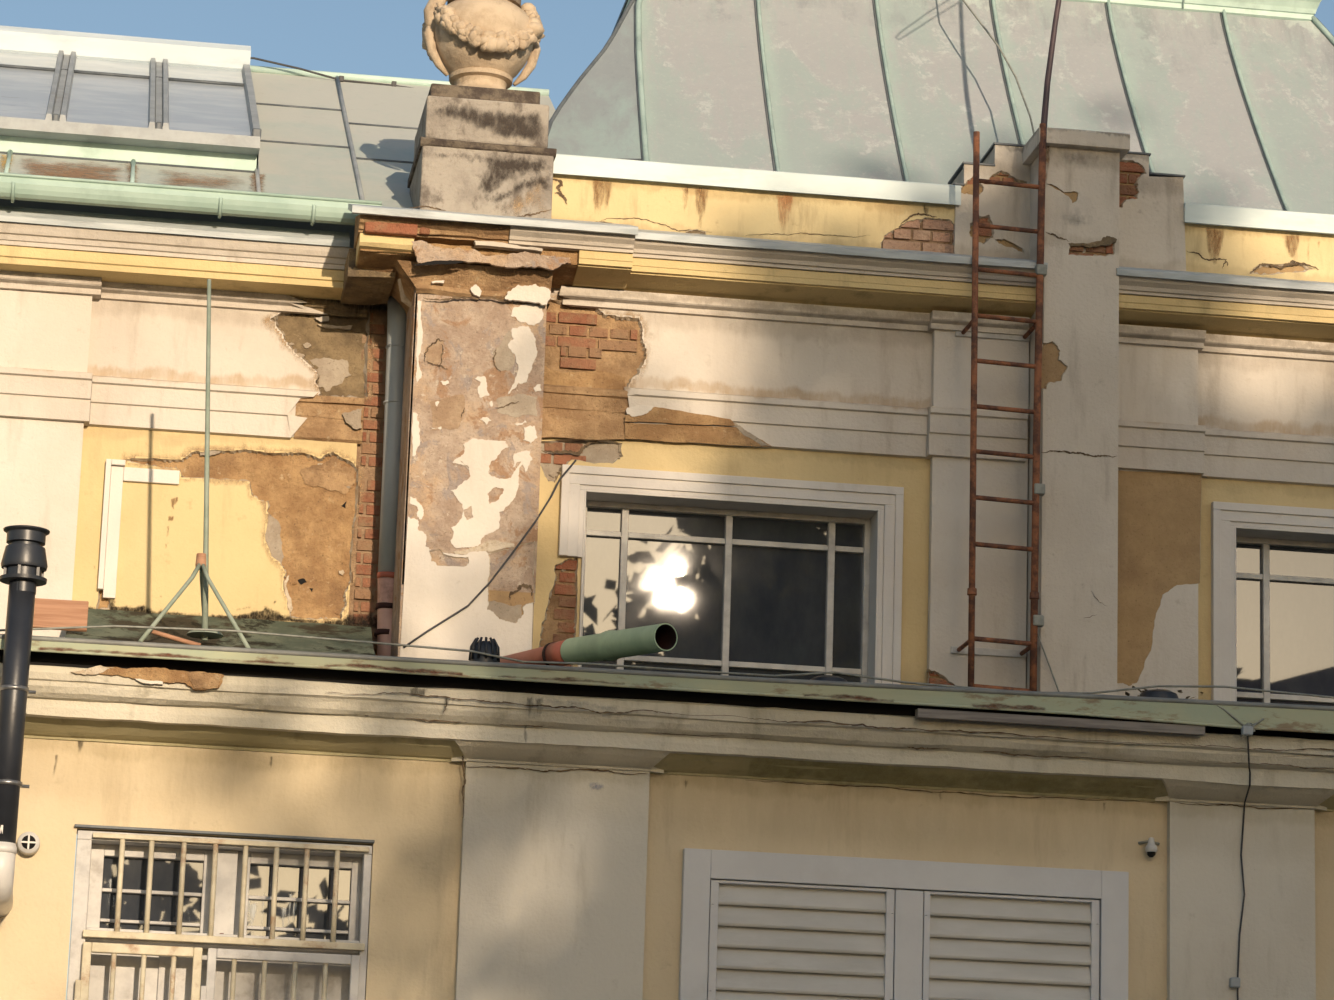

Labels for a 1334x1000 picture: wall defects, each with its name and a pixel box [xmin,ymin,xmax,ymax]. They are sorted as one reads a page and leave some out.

leakage [440,106,541,138]
leakage [167,173,229,186]
leakage [481,158,546,207]
spalling [1119,159,1146,208]
spalling [881,213,1024,254]
spalling [1068,236,1117,256]
leakage [1207,228,1223,254]
crack [1187,251,1319,271]
spalling [124,304,387,655]
peeling [400,280,647,661]
peeling [1117,470,1202,686]
spalling [71,665,113,675]